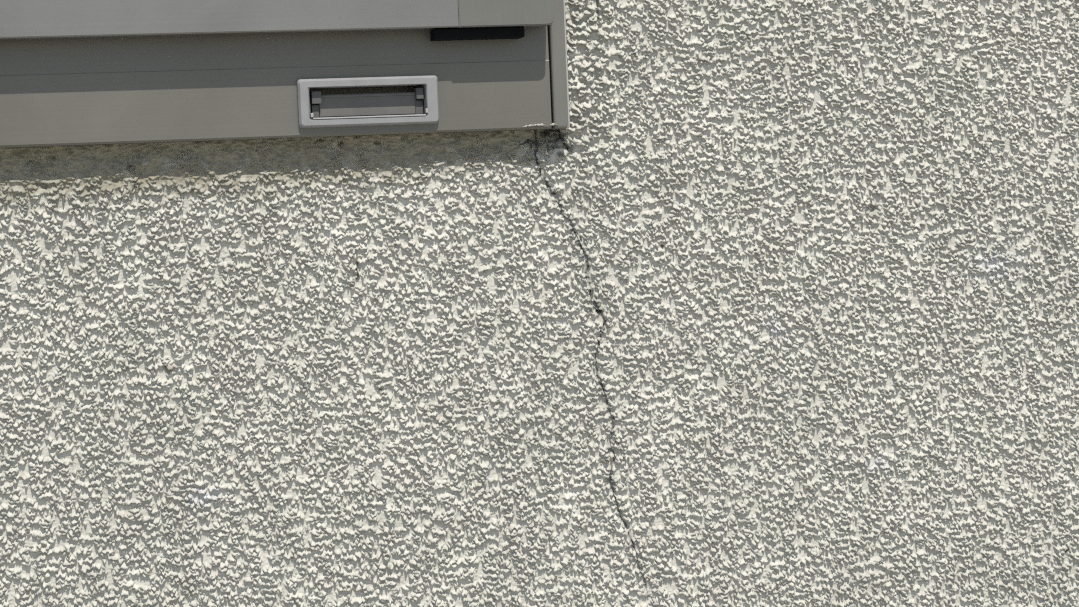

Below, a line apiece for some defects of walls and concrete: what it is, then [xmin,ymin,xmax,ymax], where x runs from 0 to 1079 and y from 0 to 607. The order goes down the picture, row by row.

crack [519,130,654,603]